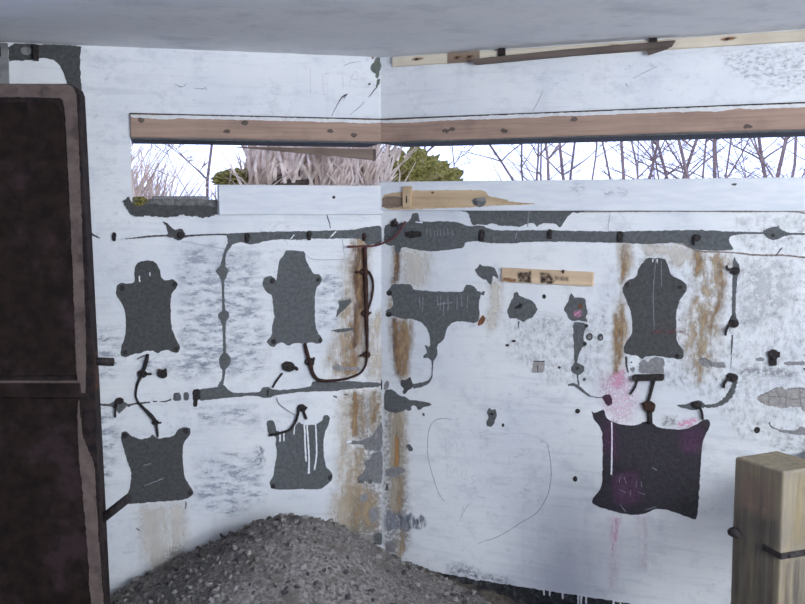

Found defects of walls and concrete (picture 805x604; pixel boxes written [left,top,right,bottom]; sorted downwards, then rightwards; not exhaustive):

peeling [116,260,258,366]
peeling [246,250,354,359]
corrosion [328,247,366,375]
corrosion [392,249,400,284]
corrosion [392,318,412,378]
corrosion [614,308,627,371]
corrosion [621,245,632,280]
peeling [622,258,687,374]
corrosion [685,252,726,383]
peeling [332,264,498,553]
peeling [564,293,710,519]
peeling [102,427,258,509]